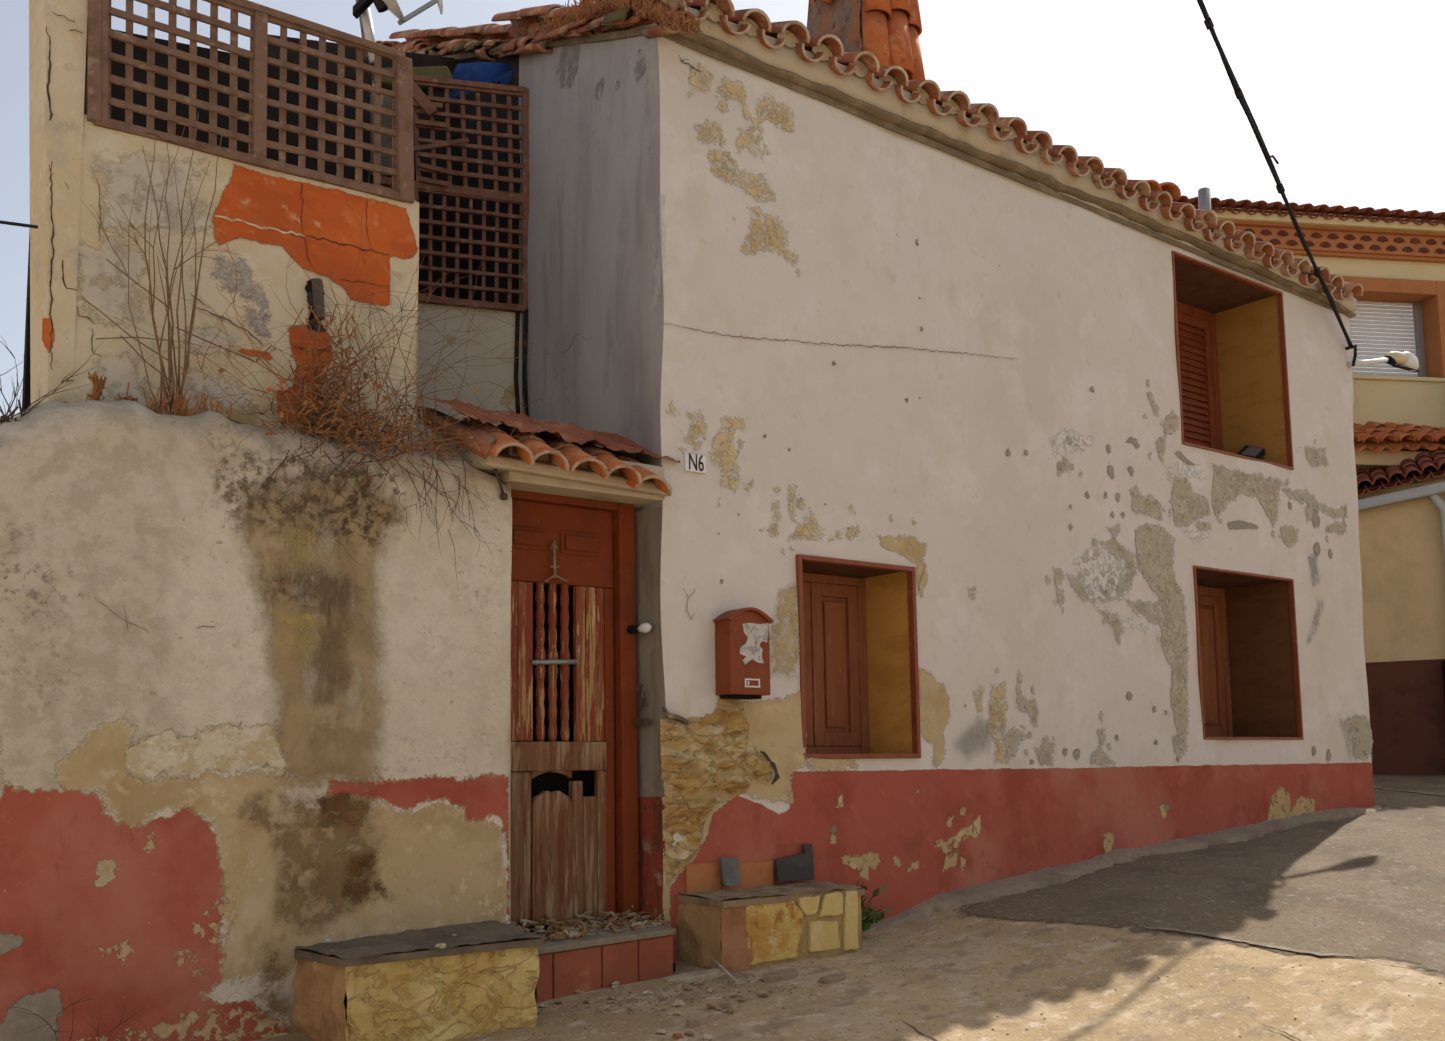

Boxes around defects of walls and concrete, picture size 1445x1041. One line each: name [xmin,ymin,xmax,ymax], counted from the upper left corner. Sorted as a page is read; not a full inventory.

peeling [688,63,800,277]
flaking render [76,150,418,423]
crack [662,323,1015,359]
peeling [54,716,511,984]
water stain [217,454,399,781]
water stain [241,795,376,927]
flaking render [660,691,858,927]
peeling [877,515,928,598]
peeling [919,668,1119,767]
peeling [1046,379,1348,762]
peeling [1343,715,1373,760]
peeling [76,1007,290,1041]